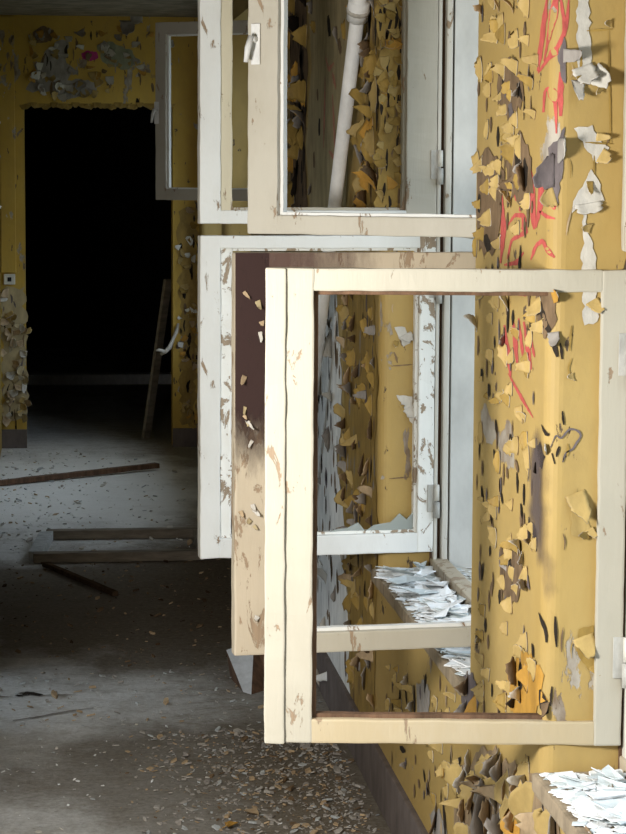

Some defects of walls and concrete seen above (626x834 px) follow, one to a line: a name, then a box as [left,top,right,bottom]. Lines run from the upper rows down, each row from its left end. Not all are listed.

flaking render [26,16,155,102]
flaking render [287,0,403,208]
peeling [469,0,612,270]
peeling [0,286,32,429]
peeling [175,207,199,429]
peeling [317,294,378,531]
peeling [463,289,563,378]
peeling [317,405,532,636]
peeling [565,488,598,539]
peeling [316,650,375,712]
peeling [385,626,550,717]
peeling [572,765,626,834]